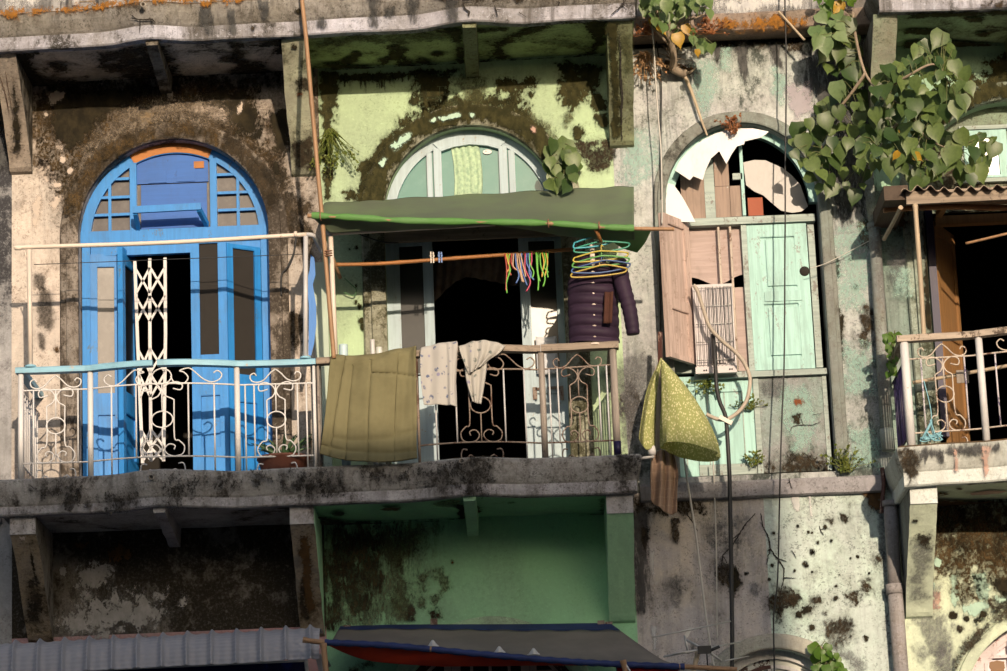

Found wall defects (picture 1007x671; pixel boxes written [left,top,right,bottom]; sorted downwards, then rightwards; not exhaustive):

water stain [0,0,464,247]
water stain [477,21,634,138]
water stain [902,10,1007,49]
water stain [28,480,141,517]
water stain [155,463,347,511]
water stain [318,455,499,631]
water stain [633,497,708,614]
water stain [706,513,872,670]
water stain [897,442,1007,671]